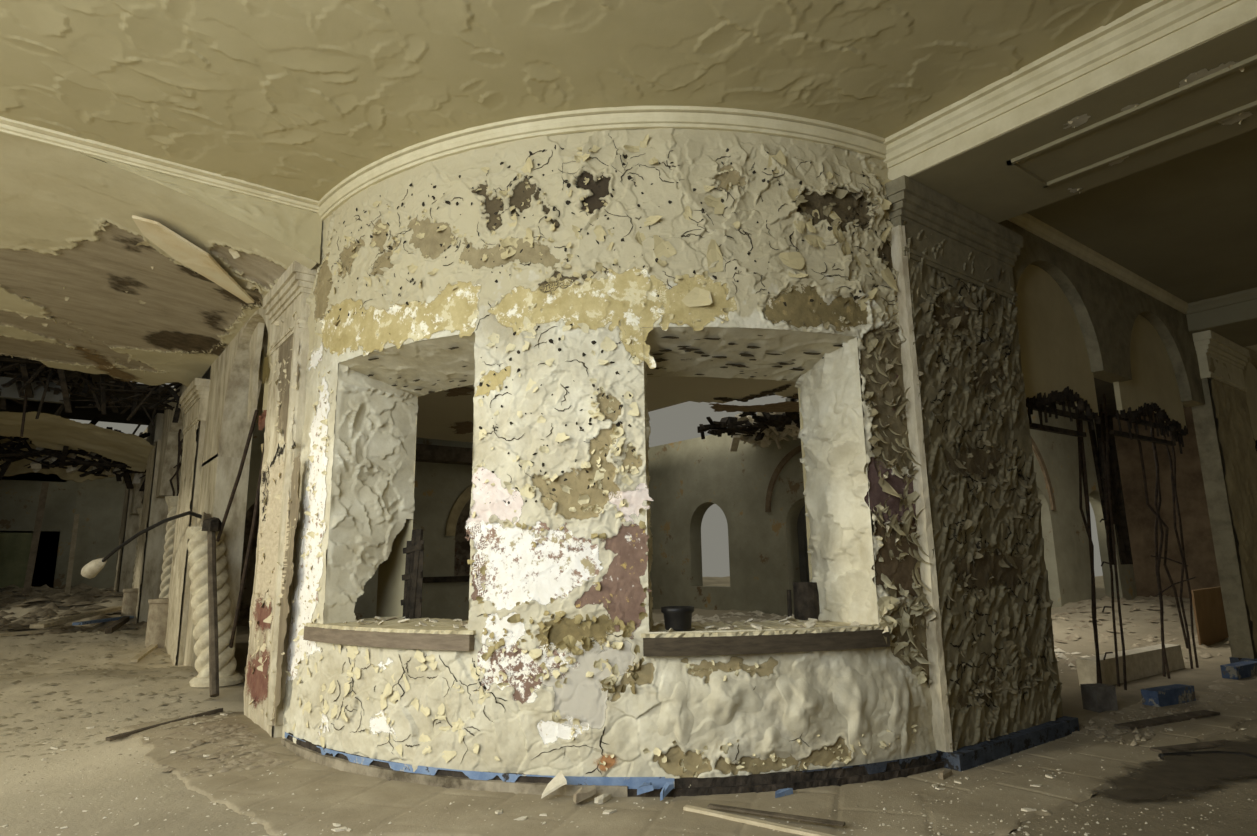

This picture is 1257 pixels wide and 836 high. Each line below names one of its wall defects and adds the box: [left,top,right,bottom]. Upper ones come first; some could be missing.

flaking render [249,134,1199,763]
corrosion [246,598,273,709]
peeling [637,725,917,801]
water stain [1092,736,1257,801]